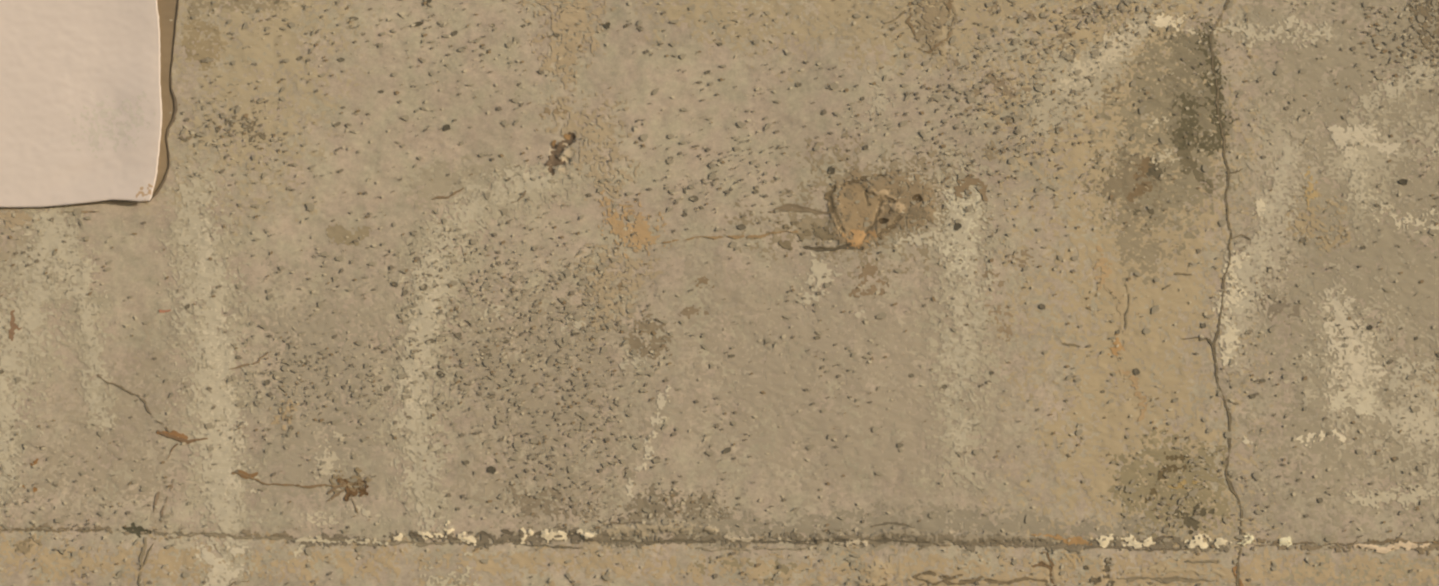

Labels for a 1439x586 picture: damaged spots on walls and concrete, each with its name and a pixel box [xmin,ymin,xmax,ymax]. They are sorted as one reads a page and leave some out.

crack [98,374,1187,586]
crack [1125,0,1439,586]